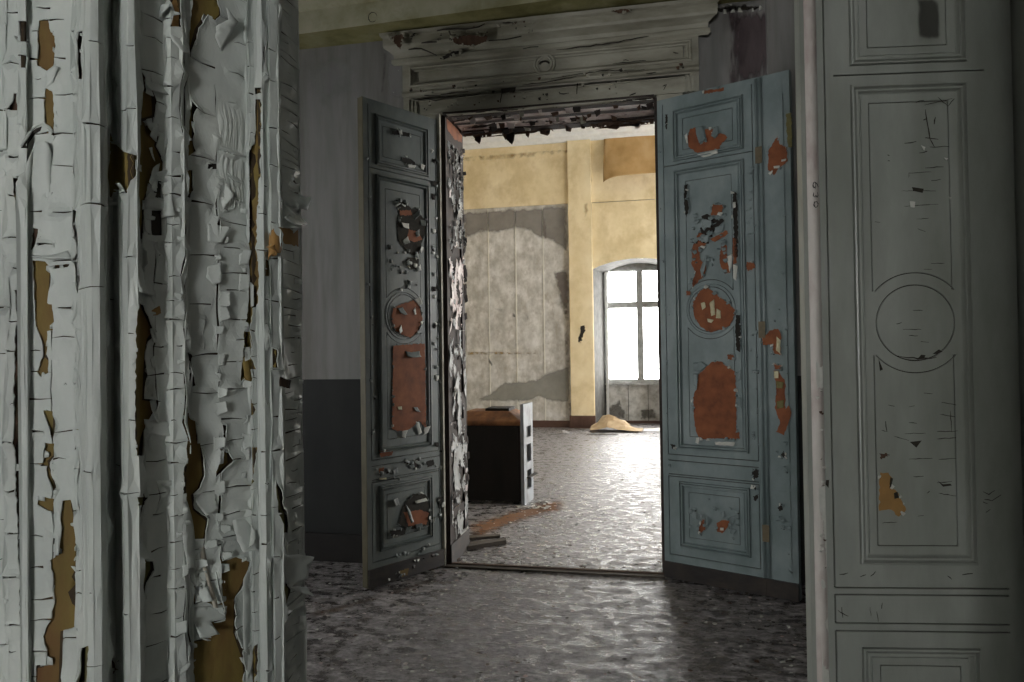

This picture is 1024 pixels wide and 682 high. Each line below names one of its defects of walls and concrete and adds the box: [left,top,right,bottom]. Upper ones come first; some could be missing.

peeling [14,18,59,135]
peeling [159,0,238,59]
peeling [685,126,728,157]
peeling [766,113,792,175]
peeling [29,228,72,377]
peeling [108,82,193,456]
peeling [175,88,314,682]
peeling [379,60,668,539]
peeling [682,184,756,446]
peeling [760,329,791,435]
peeling [34,409,79,682]
peeling [878,472,906,517]